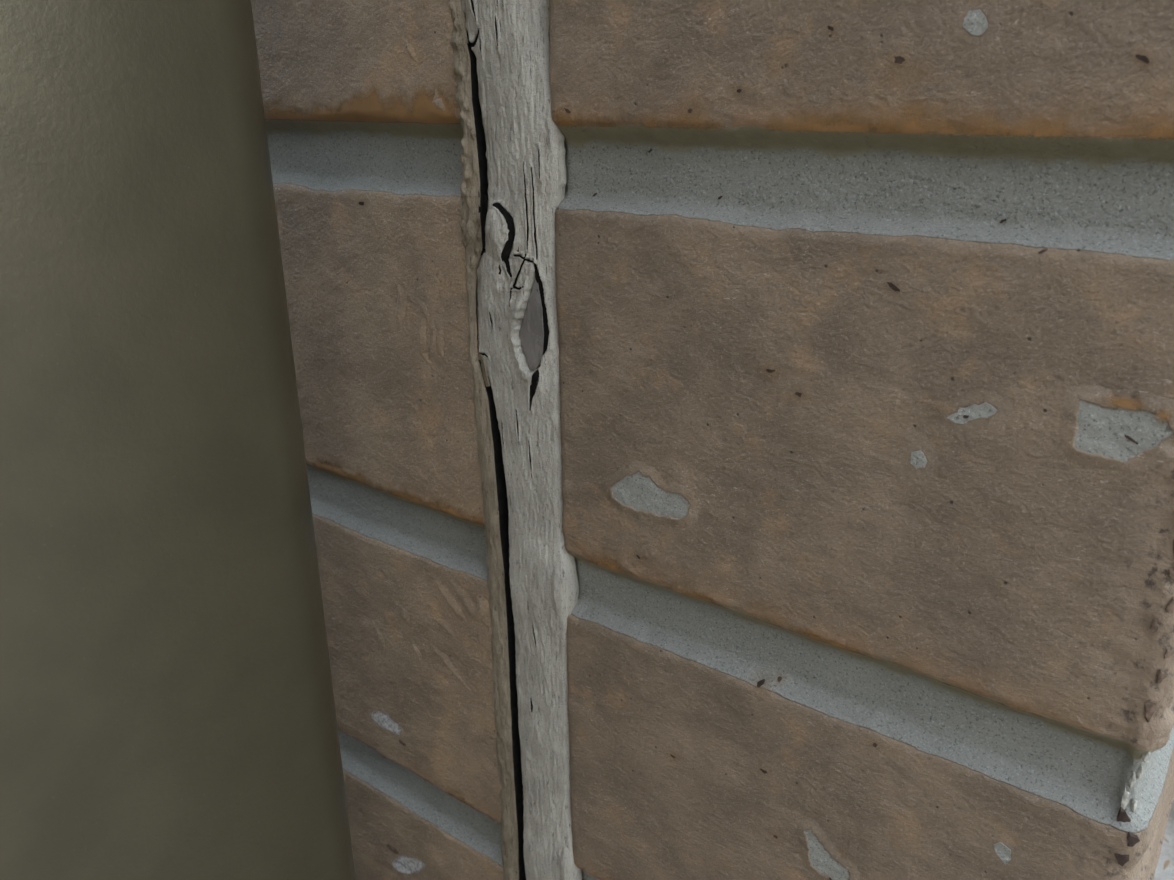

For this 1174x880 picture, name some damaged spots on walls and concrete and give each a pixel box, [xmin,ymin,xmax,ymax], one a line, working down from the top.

corrosion [264,88,460,124]
corrosion [767,105,1083,137]
crack [467,0,540,880]
peeling [938,391,1013,437]
peeling [1058,385,1174,478]
peeling [603,460,702,529]
peeling [796,818,860,880]